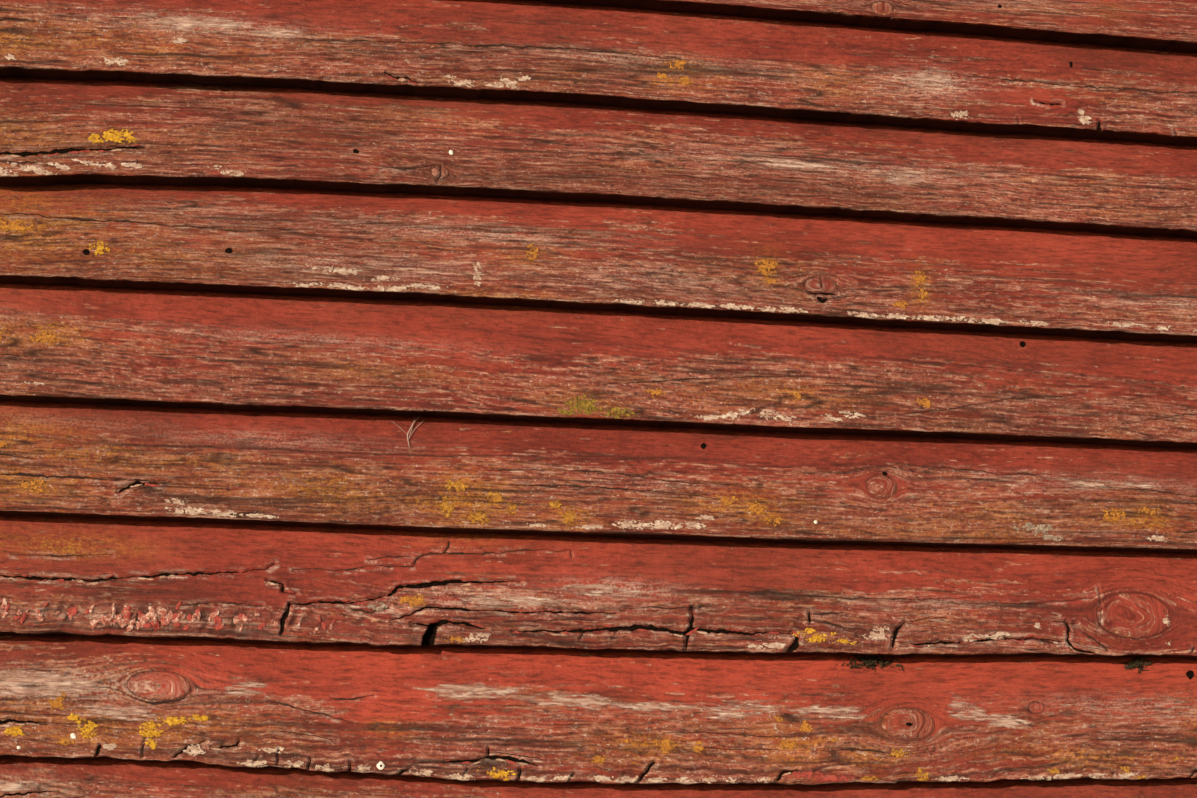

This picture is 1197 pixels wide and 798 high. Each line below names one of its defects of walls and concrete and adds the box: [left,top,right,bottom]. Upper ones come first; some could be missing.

crack [0,144,145,164]
crack [0,541,1108,653]
crack [0,718,40,726]
crack [398,748,542,780]